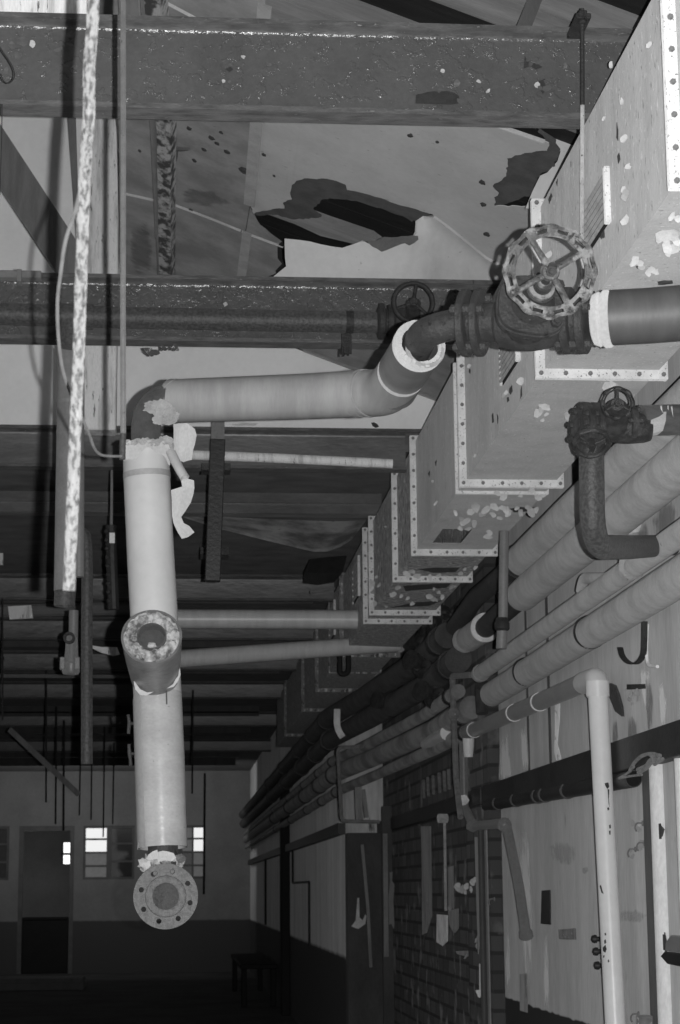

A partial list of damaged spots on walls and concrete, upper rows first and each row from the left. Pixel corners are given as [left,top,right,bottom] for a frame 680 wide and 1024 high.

peeling [414,80,464,105]
peeling [616,126,631,169]